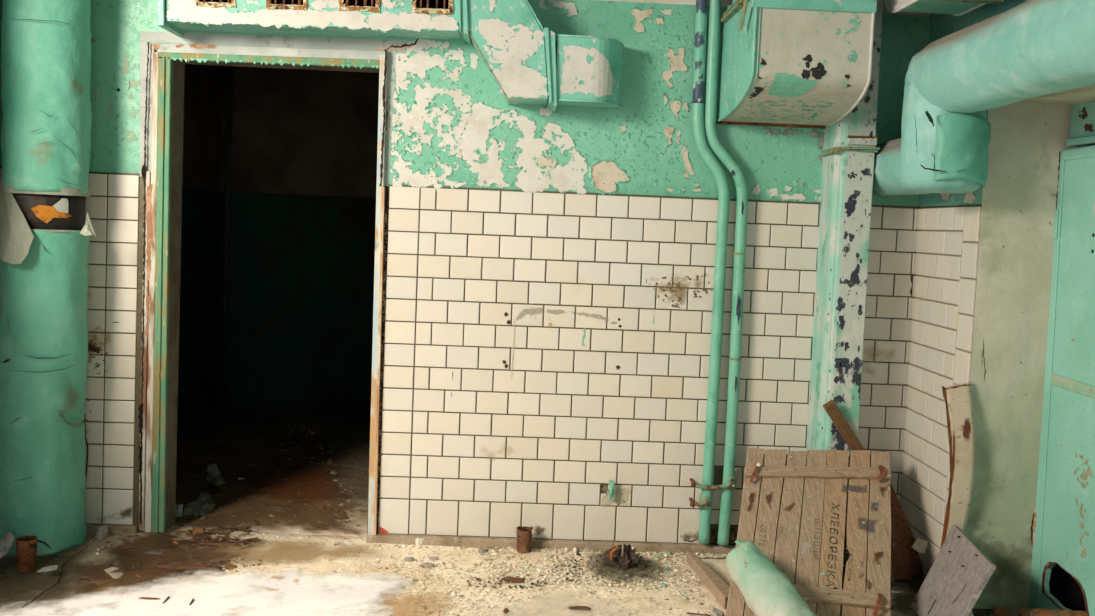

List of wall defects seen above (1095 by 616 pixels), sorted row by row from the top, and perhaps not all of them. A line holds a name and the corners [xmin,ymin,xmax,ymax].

peeling [801,54,827,80]
peeling [165,0,632,195]
peeling [844,168,869,217]
peeling [843,262,860,288]
peeling [836,297,862,330]
peeling [833,342,863,403]